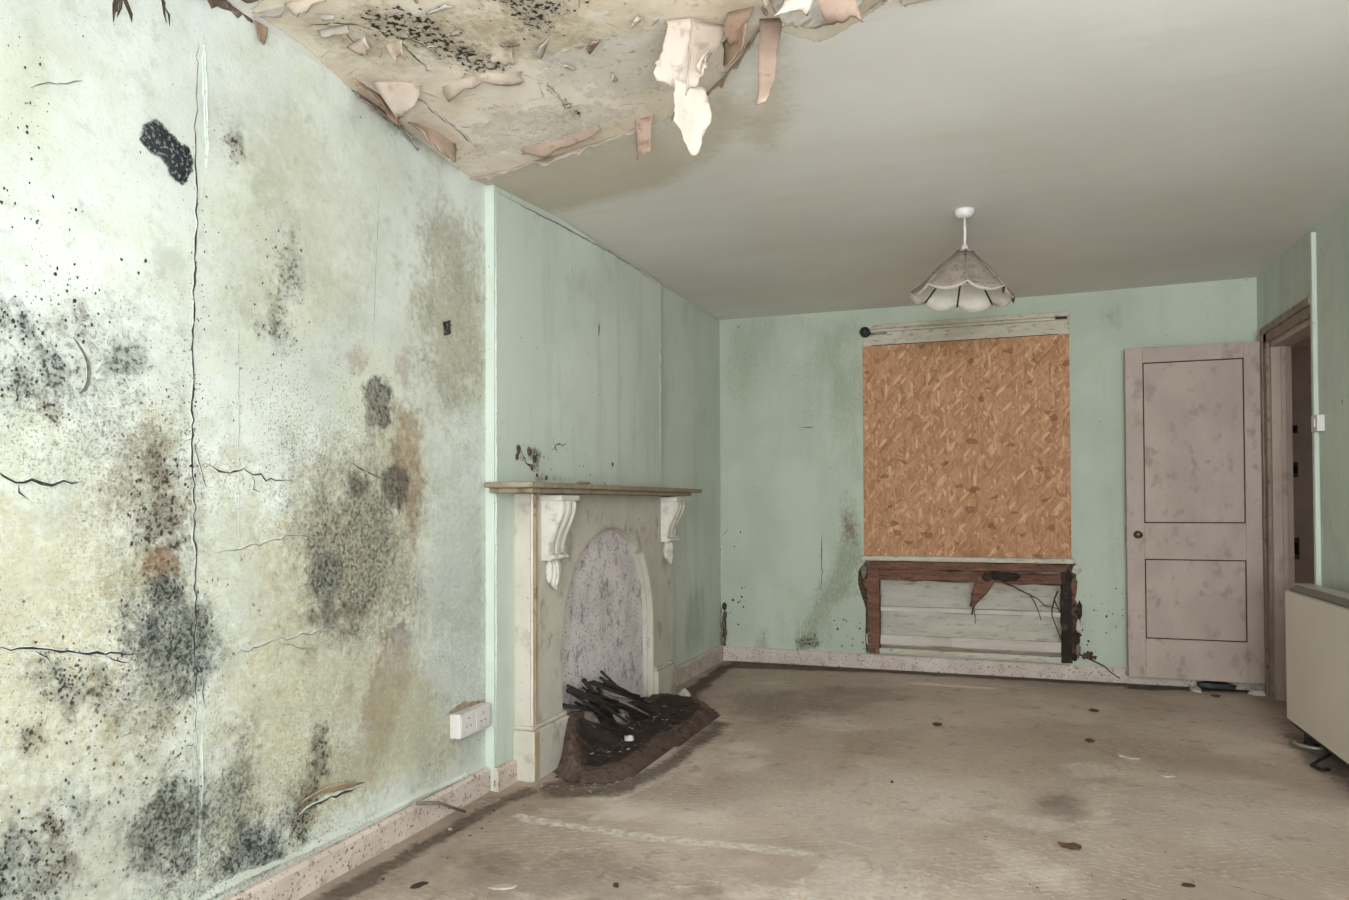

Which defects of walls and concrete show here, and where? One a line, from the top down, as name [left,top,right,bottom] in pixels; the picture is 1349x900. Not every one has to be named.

peeling [112,0,133,22]
peeling [160,0,170,26]
spalling [207,0,253,23]
peeling [536,16,668,98]
crack [30,80,81,88]
peeling [373,82,422,118]
water stain [420,314,481,409]
crack [186,40,352,778]
crack [0,473,83,500]
water stain [0,120,344,900]
water stain [267,369,433,649]
crack [0,645,147,668]